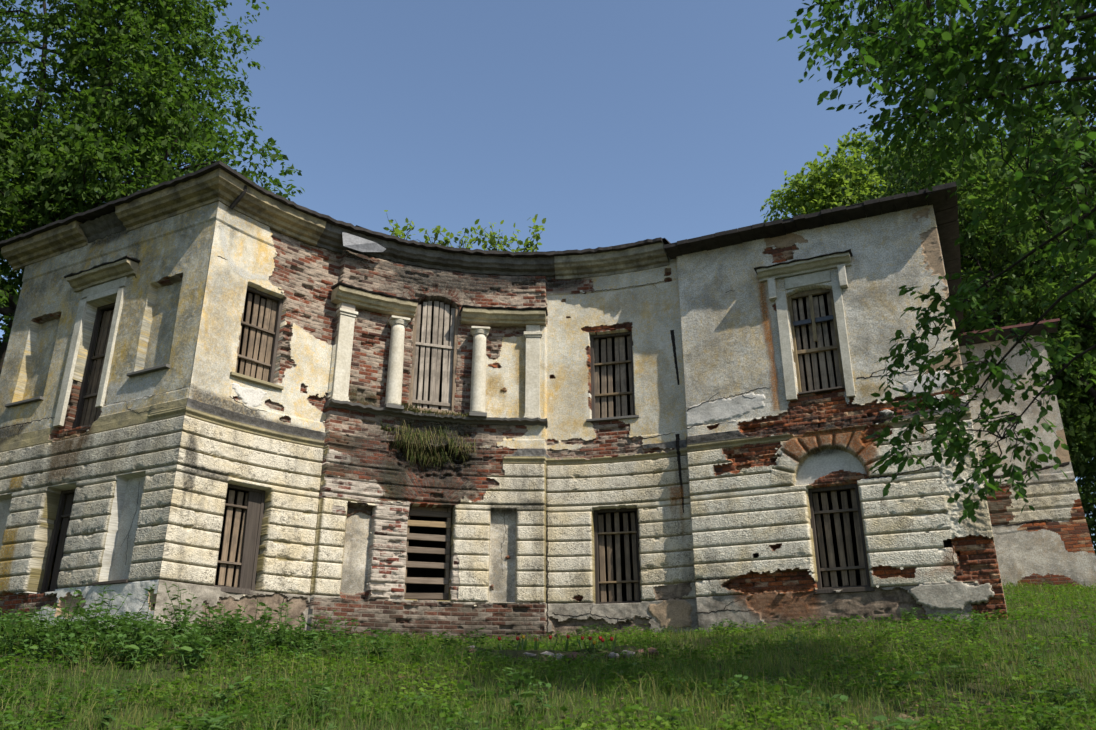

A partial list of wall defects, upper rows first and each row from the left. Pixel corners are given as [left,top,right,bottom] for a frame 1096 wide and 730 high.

flaking render [762,233,808,263]
flaking render [912,208,949,298]
flaking render [231,228,594,448]
spalling [581,322,633,334]
flaking render [545,346,675,460]
crack [642,330,771,513]
rust [759,282,777,406]
flaking render [713,345,965,476]
flaking render [319,449,411,601]
flaking render [449,552,460,600]
flaking render [721,543,930,629]
spalling [943,483,1095,620]